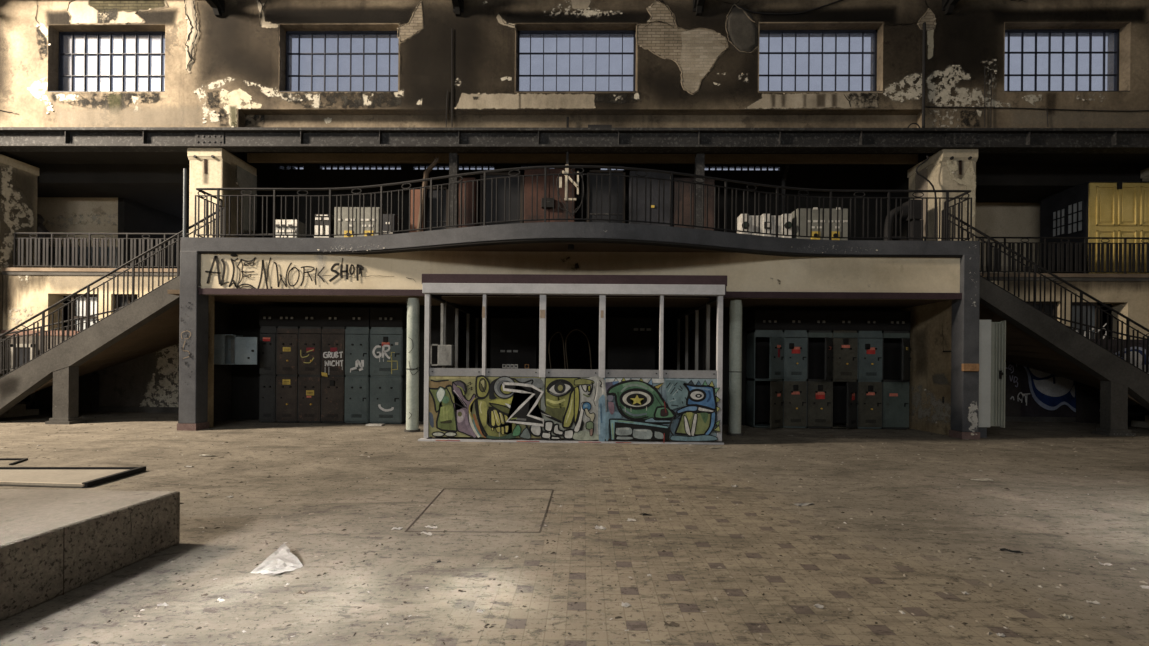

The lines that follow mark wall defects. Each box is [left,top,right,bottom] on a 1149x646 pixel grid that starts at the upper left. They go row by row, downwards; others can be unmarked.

flaking render [397,1,424,43]
flaking render [544,0,623,17]
peeling [194,77,303,127]
flaking render [454,76,596,110]
flaking render [635,0,729,95]
flaking render [745,8,1042,128]
peeling [0,166,34,272]